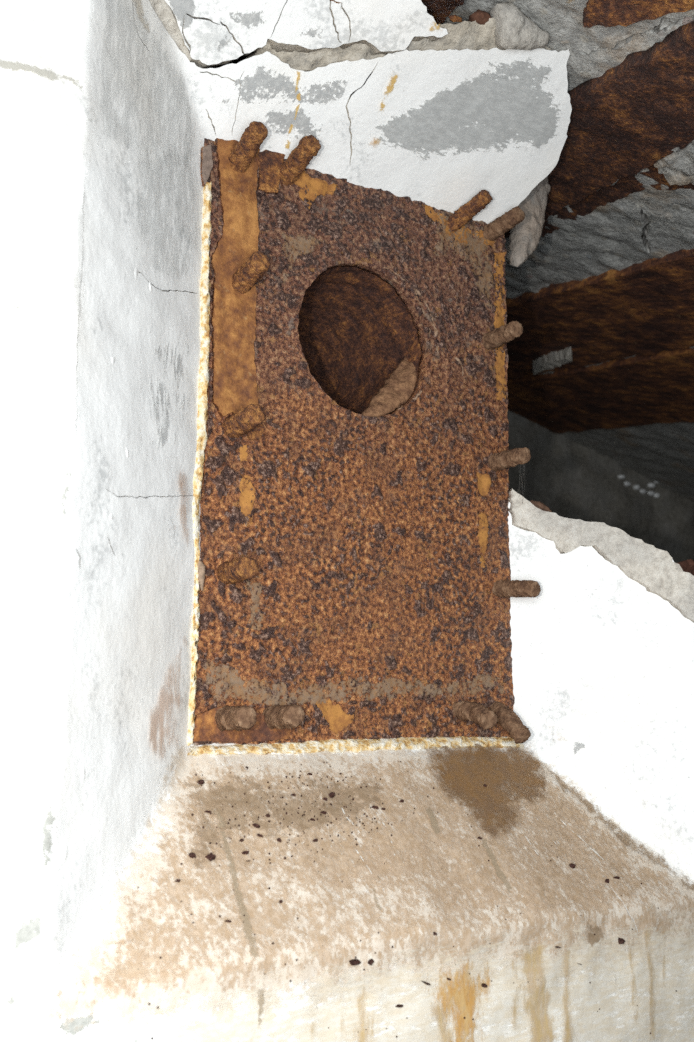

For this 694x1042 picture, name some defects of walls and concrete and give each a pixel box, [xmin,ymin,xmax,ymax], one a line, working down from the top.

crack [132,0,245,131]
peeling [230,10,266,28]
peeling [219,29,385,139]
peeling [376,17,561,160]
corrosion [294,171,338,209]
corrosion [425,205,507,328]
corrosion [361,356,430,417]
corrosion [239,475,256,527]
spalling [508,488,694,623]
leakage [215,812,257,957]
corrosion [47,659,694,1042]
leakage [586,925,603,945]